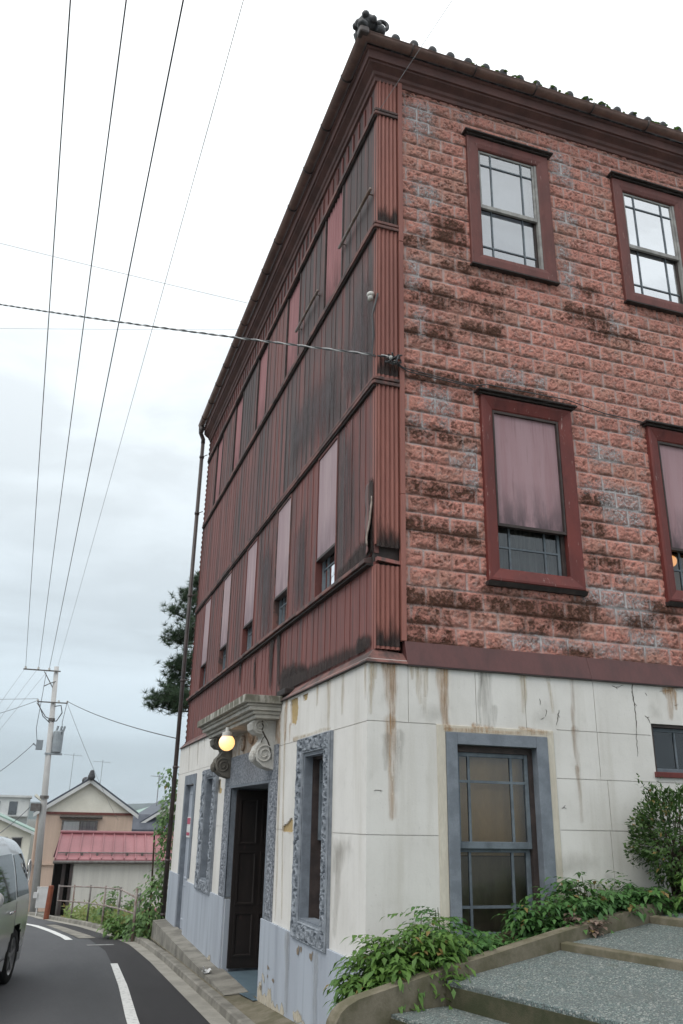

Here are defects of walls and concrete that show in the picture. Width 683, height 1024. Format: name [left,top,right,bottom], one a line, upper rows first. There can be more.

damp [403,232,432,249]
damp [440,256,503,296]
damp [409,292,505,349]
damp [590,326,641,344]
damp [407,615,452,632]
damp [517,619,595,658]
damp [641,597,679,624]
spalling [292,694,308,724]
crack [613,684,676,752]